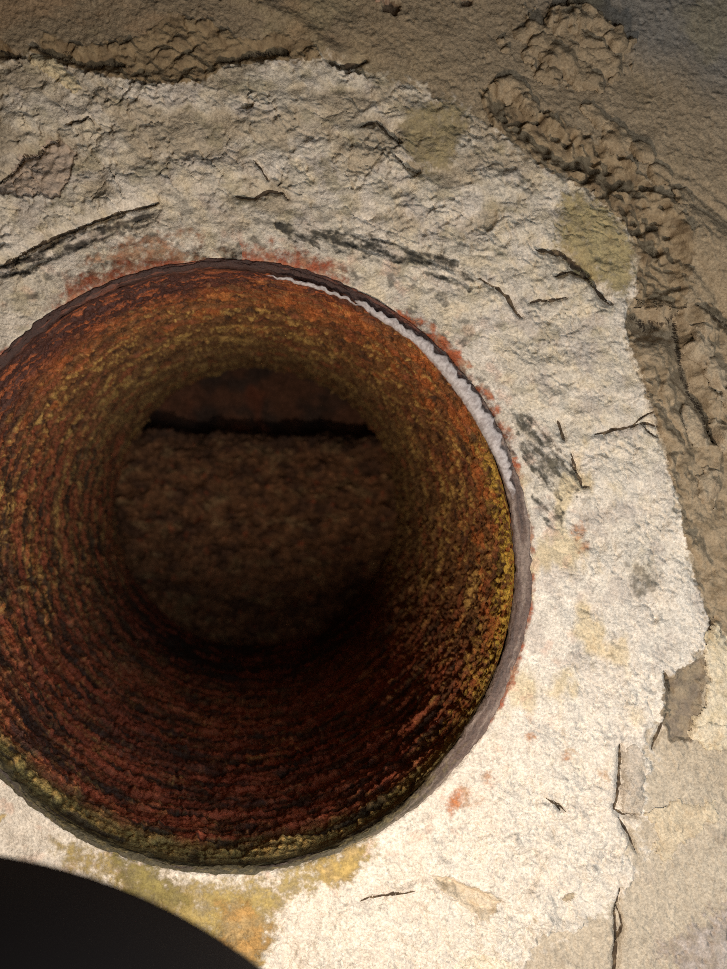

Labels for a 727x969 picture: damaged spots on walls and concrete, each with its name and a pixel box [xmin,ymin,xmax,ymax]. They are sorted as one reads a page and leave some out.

spalling [29,12,322,94]
peeling [0,138,77,199]
crack [0,203,158,268]
spalling [0,213,159,279]
rust [67,236,204,301]
rust [240,239,345,282]
spalling [274,222,475,293]
rust [397,310,472,369]
spalling [479,82,727,752]
rust [448,787,467,812]
crack [613,744,636,850]
crack [612,888,623,969]